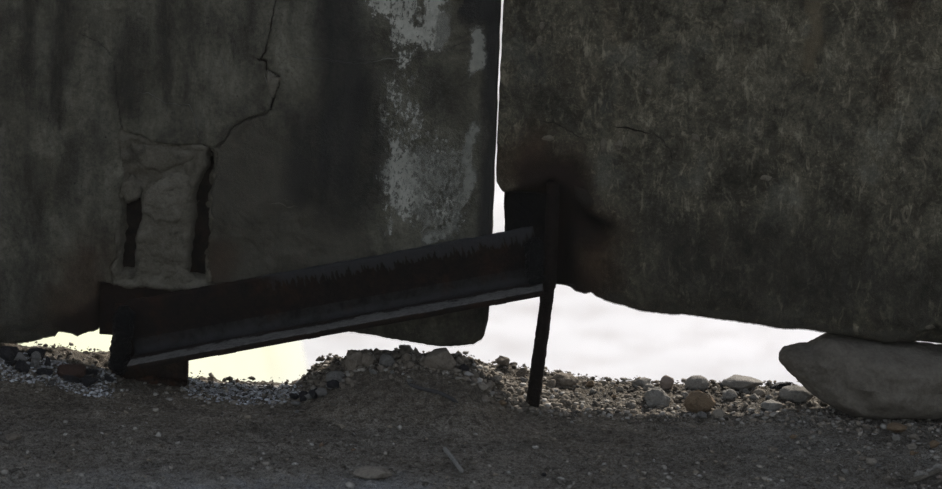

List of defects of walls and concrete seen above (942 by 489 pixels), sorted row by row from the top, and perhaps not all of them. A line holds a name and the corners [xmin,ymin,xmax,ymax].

crack [219,1,280,146]
leakage [407,0,500,245]
spalling [110,129,217,292]
spalling [504,186,544,232]
rust [500,129,615,296]